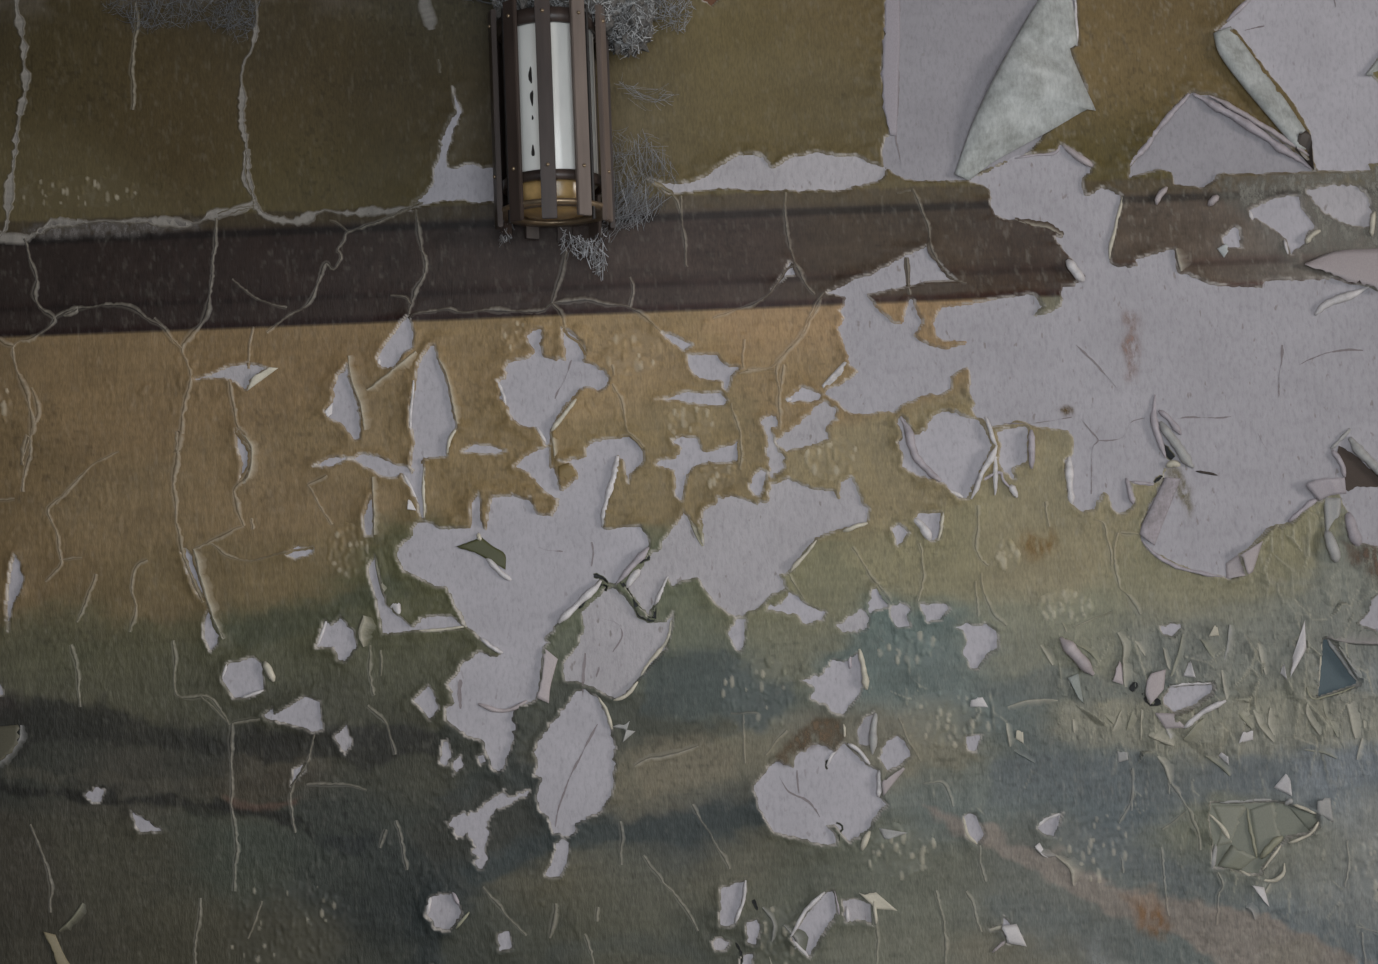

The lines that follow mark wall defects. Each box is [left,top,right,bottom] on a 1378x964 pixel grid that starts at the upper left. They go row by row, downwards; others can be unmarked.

crack [0,0,661,709]
peeling [317,0,1378,886]
crack [366,645,397,755]
crack [29,824,55,913]
crack [170,640,263,964]
crack [287,734,367,833]
crack [378,820,410,871]
peeling [426,892,470,929]
peeling [498,931,512,951]
crack [482,886,600,964]
peeling [713,880,897,964]
peeling [1209,774,1333,920]